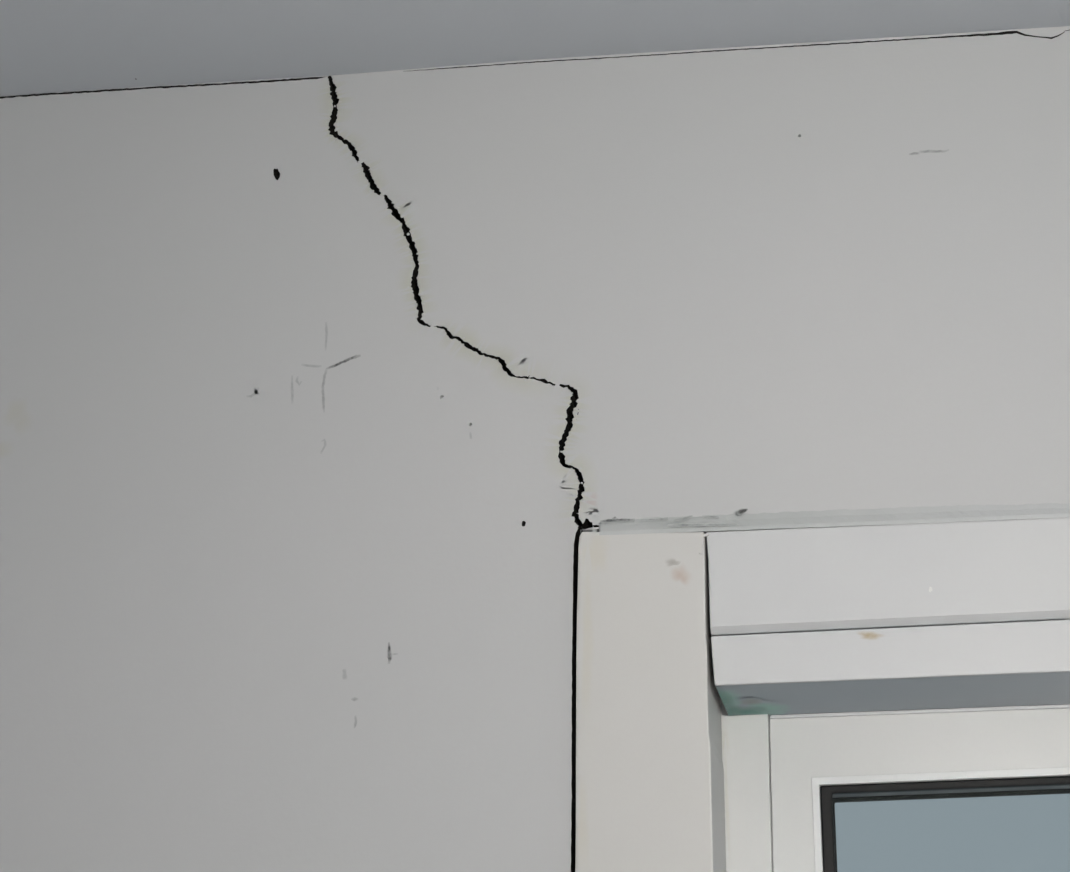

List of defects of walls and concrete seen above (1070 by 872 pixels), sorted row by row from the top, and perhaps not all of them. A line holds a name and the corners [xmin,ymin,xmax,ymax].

crack [0,76,587,872]
crack [592,503,1070,535]